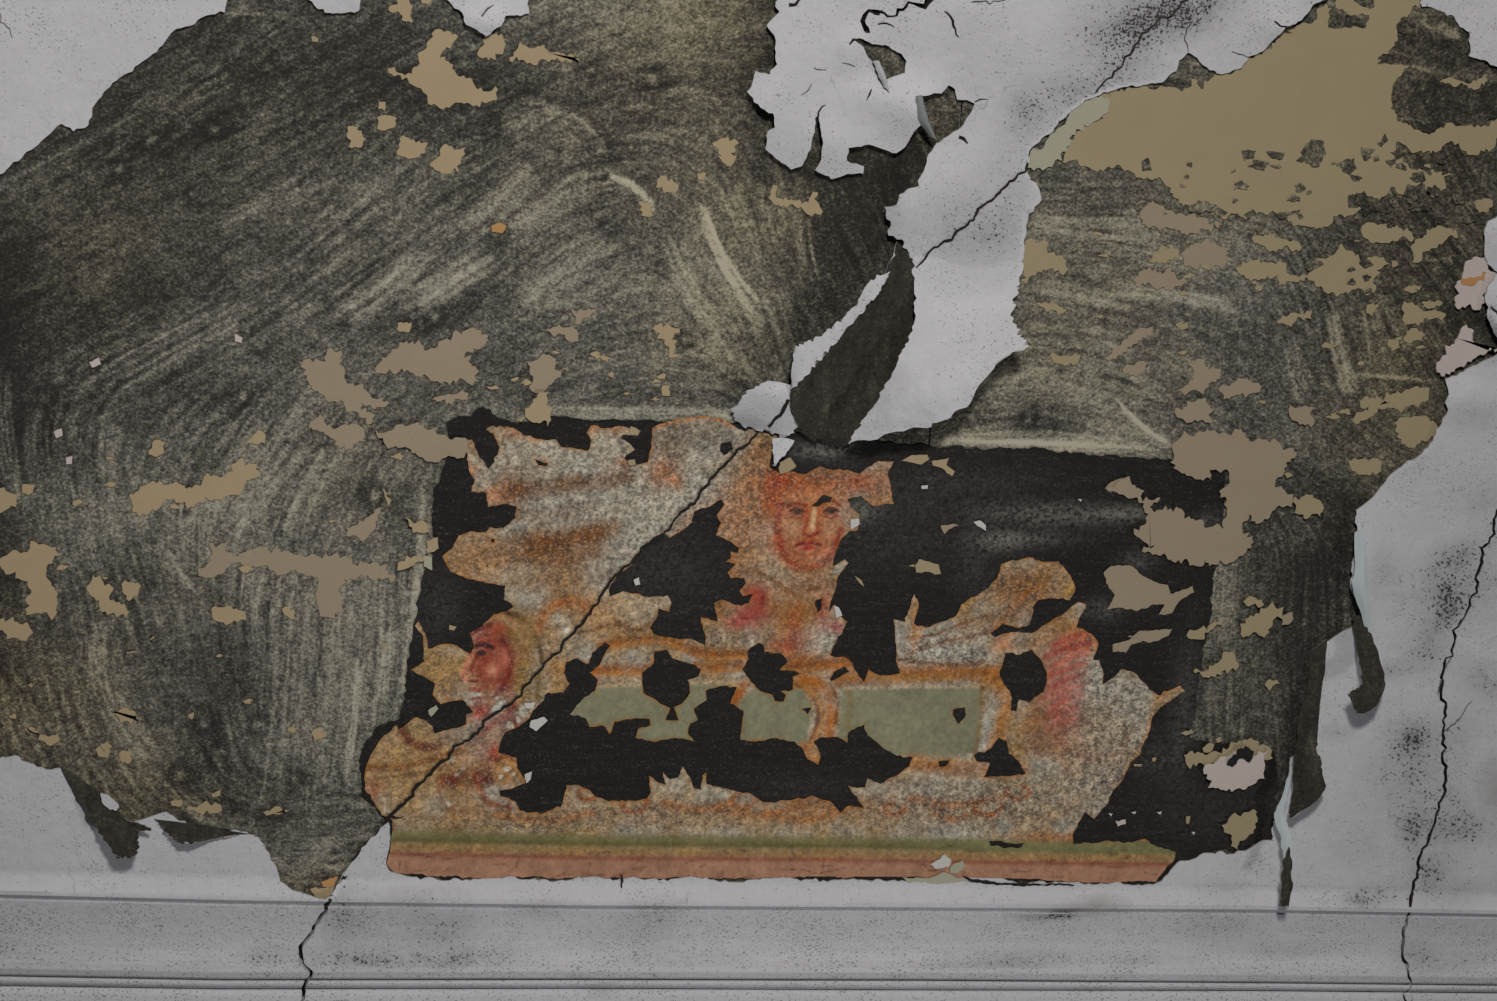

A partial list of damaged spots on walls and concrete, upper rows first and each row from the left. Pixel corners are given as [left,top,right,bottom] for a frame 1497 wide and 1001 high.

crack [802,0,1004,123]
crack [1097,0,1192,90]
crack [915,163,1029,269]
peeling [0,0,969,898]
peeling [790,0,1497,811]
leakage [1381,502,1497,673]
crack [298,399,790,996]
peeling [1209,809,1268,854]
leakage [1347,718,1482,909]
crack [1401,509,1497,1001]